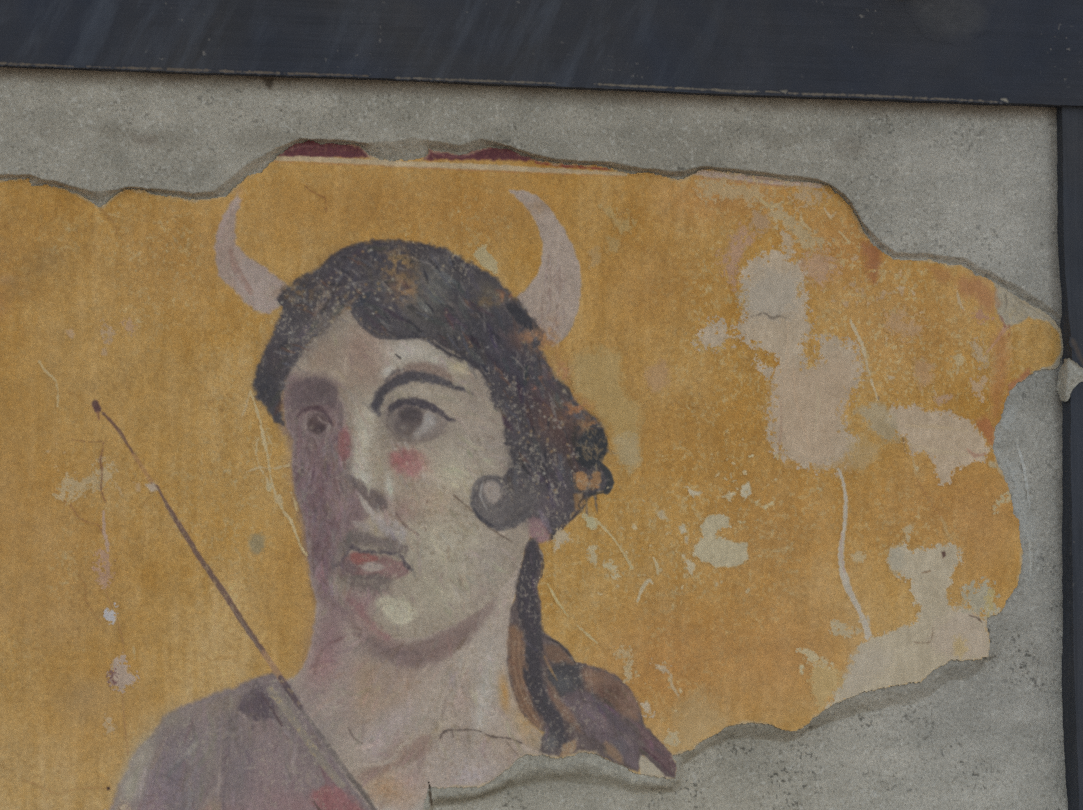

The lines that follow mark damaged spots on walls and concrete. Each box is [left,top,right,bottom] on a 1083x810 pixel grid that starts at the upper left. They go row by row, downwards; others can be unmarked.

peeling [581,174,1006,604]
peeling [550,526,573,554]
crack [836,467,873,640]
peeling [795,523,1002,713]